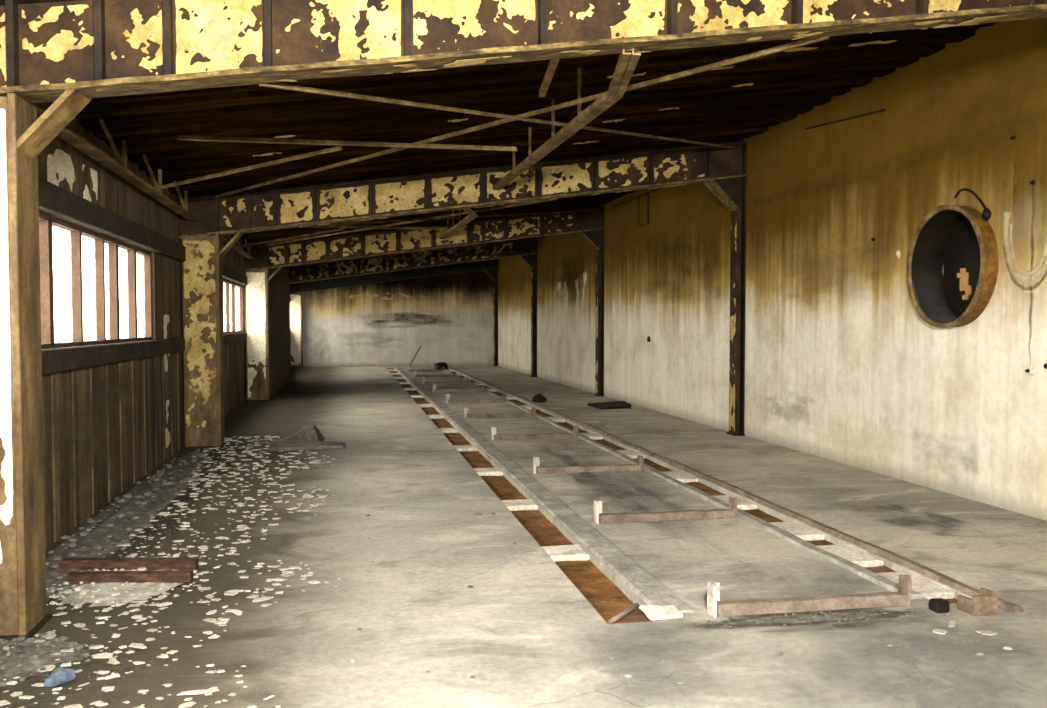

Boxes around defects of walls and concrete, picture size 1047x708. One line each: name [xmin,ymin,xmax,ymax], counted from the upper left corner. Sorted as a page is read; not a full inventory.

peeling [22,4,94,62]
peeling [111,6,163,75]
peeling [175,0,262,74]
peeling [285,0,536,74]
peeling [610,0,665,53]
peeling [678,0,788,41]
peeling [784,0,837,52]
peeling [47,149,98,202]
peeling [222,154,704,227]
peeling [0,109,13,525]
peeling [183,240,217,430]
peeling [246,215,573,398]